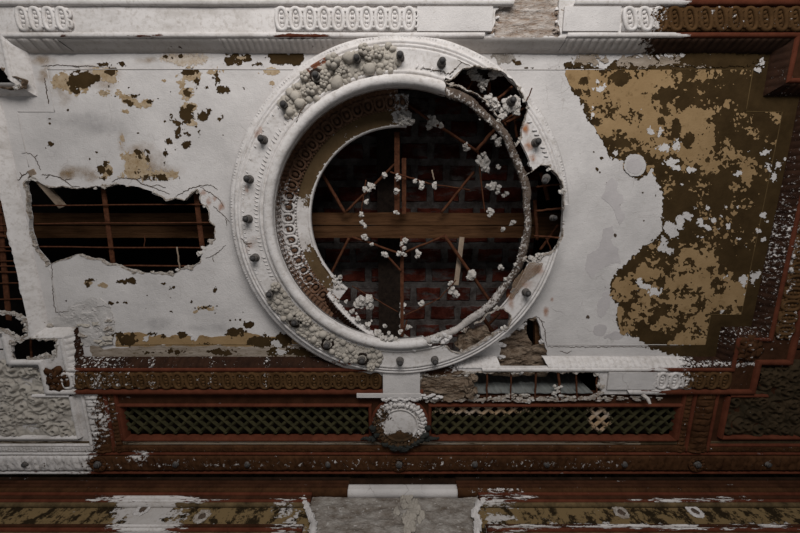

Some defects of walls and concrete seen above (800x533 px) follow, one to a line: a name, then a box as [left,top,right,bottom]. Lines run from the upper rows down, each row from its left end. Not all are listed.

flaking render [485,0,563,37]
flaking render [444,53,534,147]
crack [19,152,79,187]
flaking render [23,53,304,298]
crack [112,177,229,226]
peeling [559,53,800,357]
flaking render [0,310,59,360]
peeling [90,318,319,357]
flaking render [420,305,605,404]
hole [192,509,212,524]
flaking render [302,495,487,533]
flaking render [685,507,705,518]